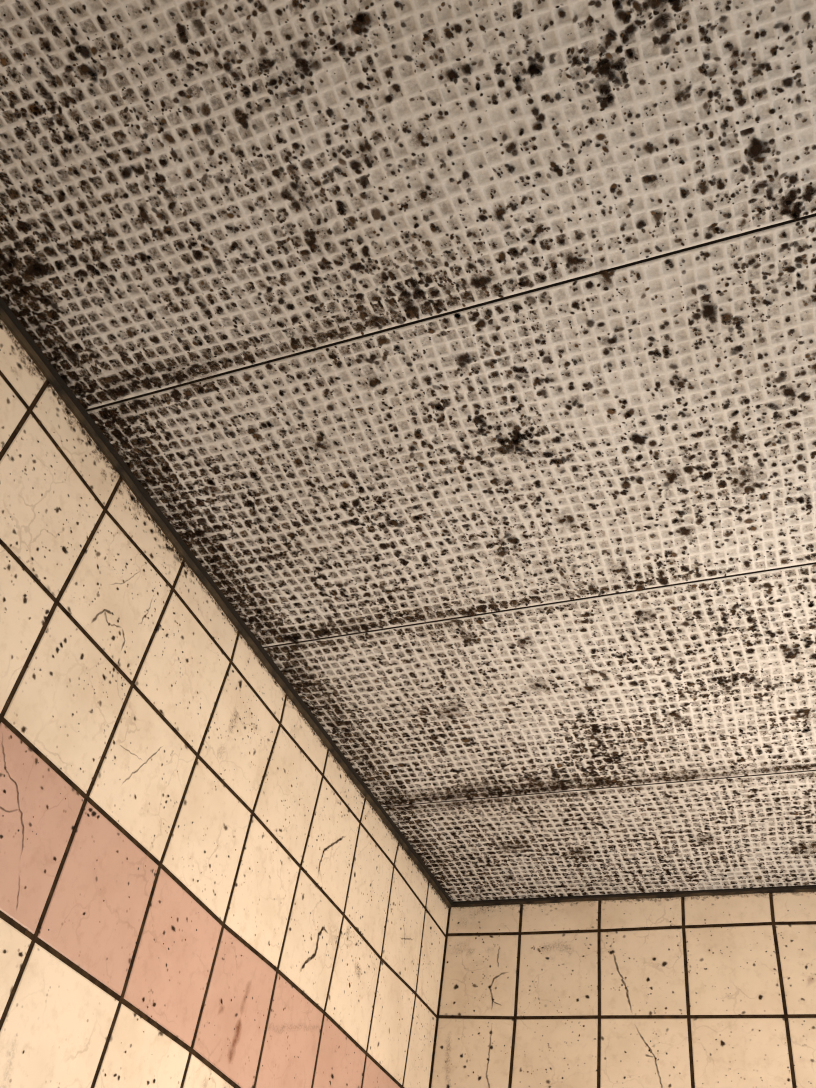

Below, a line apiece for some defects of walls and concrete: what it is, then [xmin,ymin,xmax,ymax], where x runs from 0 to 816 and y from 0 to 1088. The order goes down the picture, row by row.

crack [0,756,24,840]
crack [302,927,327,969]
crack [614,956,631,1007]